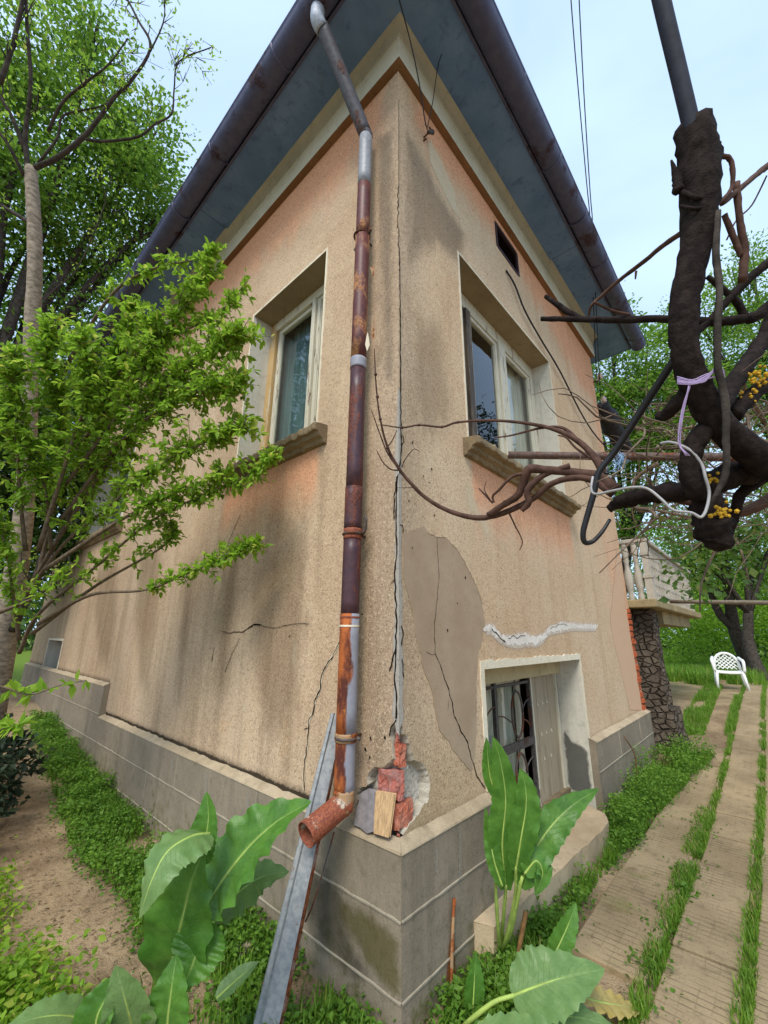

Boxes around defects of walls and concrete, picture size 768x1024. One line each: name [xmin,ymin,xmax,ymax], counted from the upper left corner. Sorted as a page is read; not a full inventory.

crack [389,106,404,736]
crack [211,623,306,671]
crack [303,642,339,791]
rust [326,759,335,802]
spalling [355,387,430,838]
rust [279,840,321,1024]